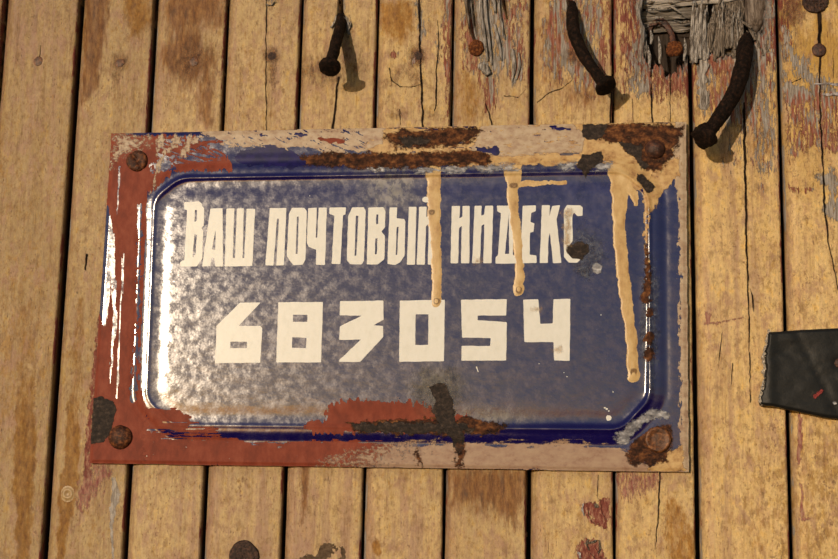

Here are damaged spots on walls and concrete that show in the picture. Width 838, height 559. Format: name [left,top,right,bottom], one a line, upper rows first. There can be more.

crack [389,0,439,127]
peeling [432,0,531,127]
peeling [538,0,736,121]
crack [719,102,754,403]
peeling [721,0,838,193]
peeling [788,166,838,222]
crack [792,12,838,290]
damp [9,302,41,559]
damp [53,295,89,559]
peeling [300,543,346,559]
peeling [576,538,607,559]
peeling [581,497,611,529]